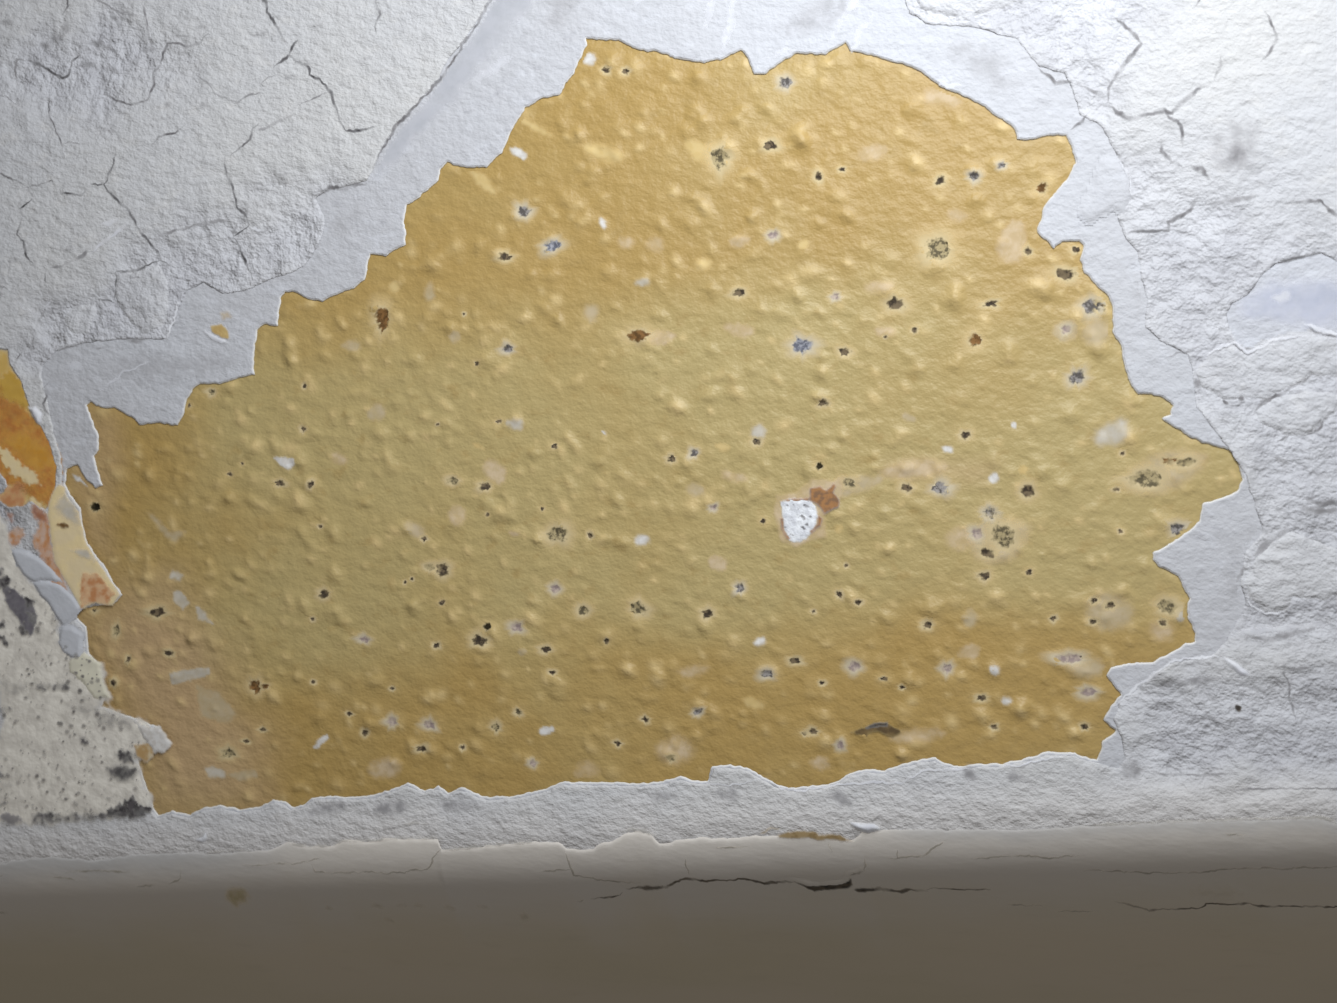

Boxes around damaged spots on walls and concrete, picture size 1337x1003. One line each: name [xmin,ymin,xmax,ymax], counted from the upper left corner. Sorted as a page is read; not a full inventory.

crack [9,56,79,144]
crack [66,0,185,105]
crack [262,0,486,153]
crack [1041,20,1208,176]
crack [0,128,265,302]
crack [1136,207,1193,233]
corrosion [0,349,66,589]
peeling [0,0,1263,826]
crack [1241,498,1336,575]
water stain [0,567,152,824]
crack [546,843,942,899]
peeling [779,822,880,841]